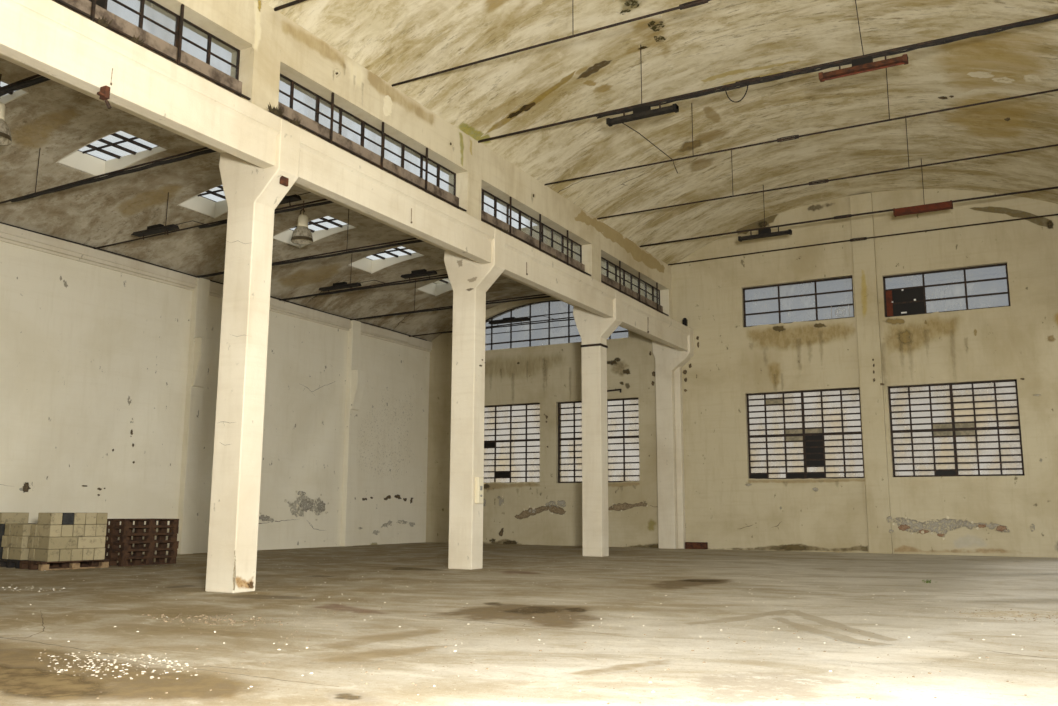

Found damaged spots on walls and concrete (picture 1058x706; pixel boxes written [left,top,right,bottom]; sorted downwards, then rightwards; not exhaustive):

damp [456,0,675,169]
damp [744,268,869,390]
damp [880,311,977,359]
peeling [259,491,329,524]
spalling [512,500,567,520]
spalling [608,501,650,512]
spalling [886,515,1012,540]